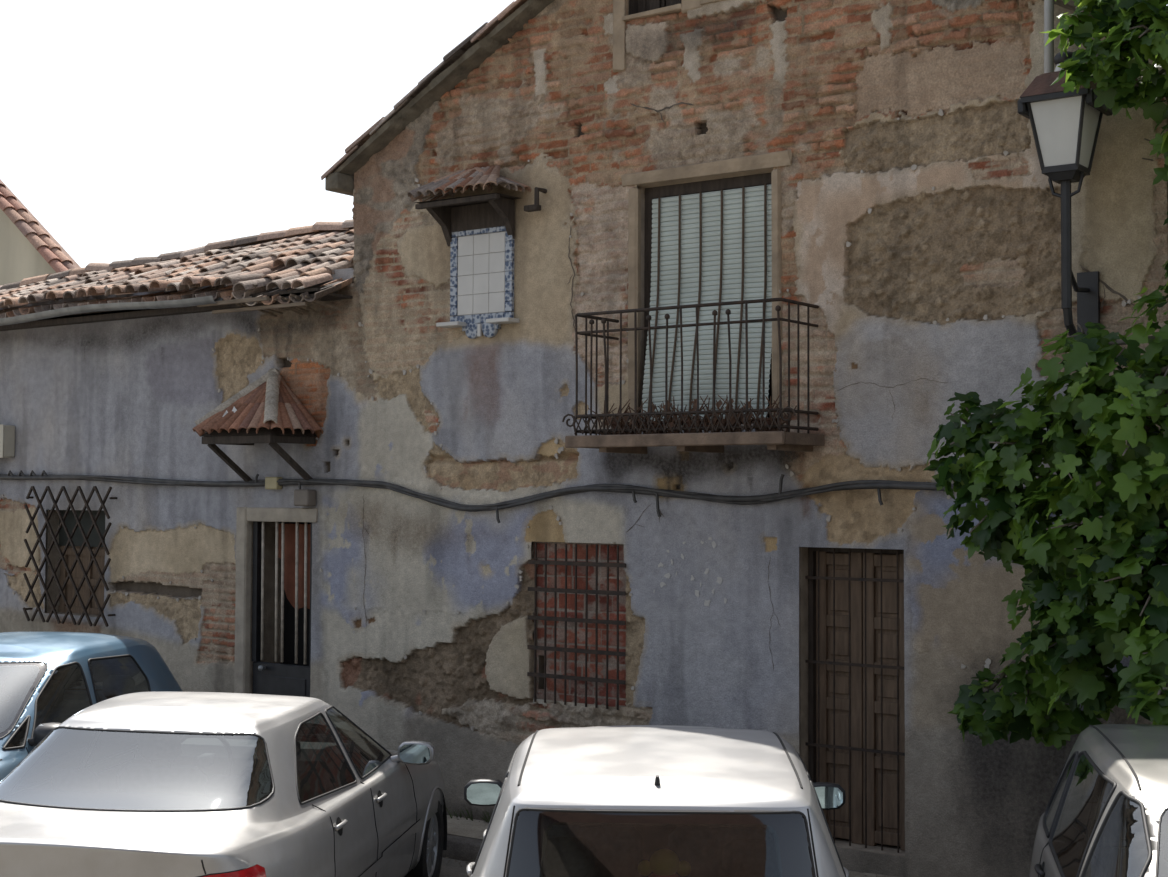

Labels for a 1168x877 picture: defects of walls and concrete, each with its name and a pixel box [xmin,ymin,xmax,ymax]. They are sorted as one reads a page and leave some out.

flaking render [1100,153,1168,355]
flaking render [212,0,1077,746]
flaking render [0,495,44,610]
flaking render [108,524,236,664]